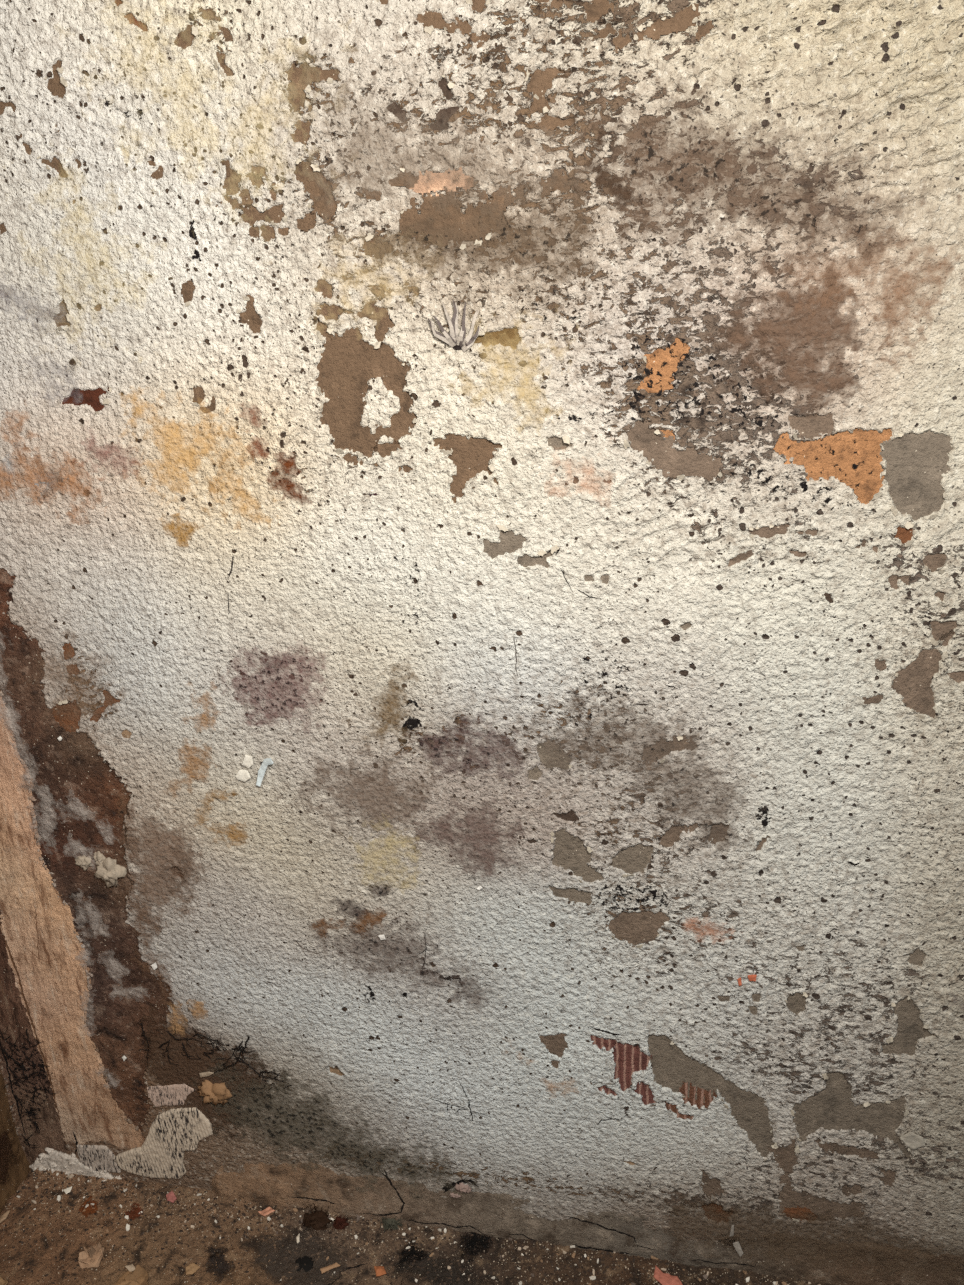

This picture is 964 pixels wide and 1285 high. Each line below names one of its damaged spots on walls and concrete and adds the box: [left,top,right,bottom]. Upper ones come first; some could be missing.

peeling [215,59,340,242]
leakage [596,117,876,255]
peeling [314,279,417,472]
leakage [545,276,861,430]
peeling [433,433,502,503]
leakage [730,436,878,510]
peeling [773,413,953,547]
leakage [377,667,522,778]
peeling [863,621,964,719]
leakage [0,566,449,1199]
leakage [596,885,668,912]
peeling [590,1034,925,1223]